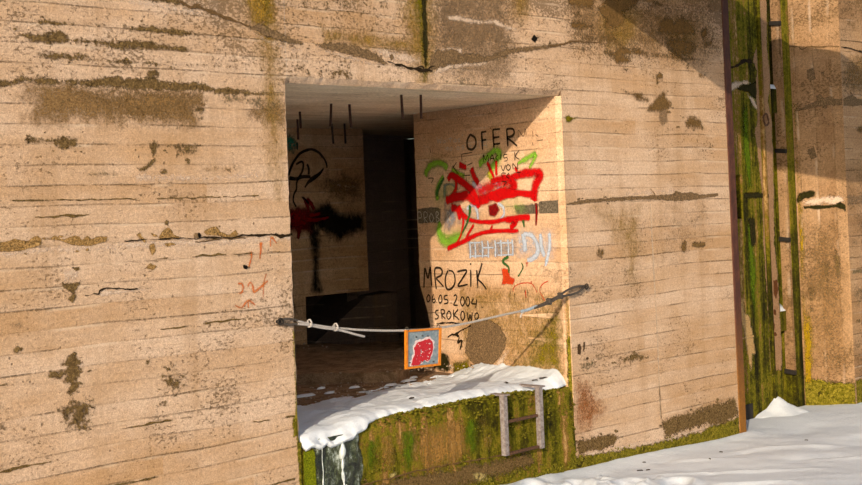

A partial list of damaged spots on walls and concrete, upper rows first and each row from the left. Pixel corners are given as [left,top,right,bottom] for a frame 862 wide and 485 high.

leakage [352,0,510,82]
crack [387,61,434,72]
spalling [732,81,757,109]
leakage [22,84,205,129]
spalling [797,190,862,211]
spalling [0,235,113,255]
spalling [137,220,181,270]
crack [124,233,292,247]
spalling [194,225,238,238]
crack [85,287,138,296]
corrosion [577,386,600,428]